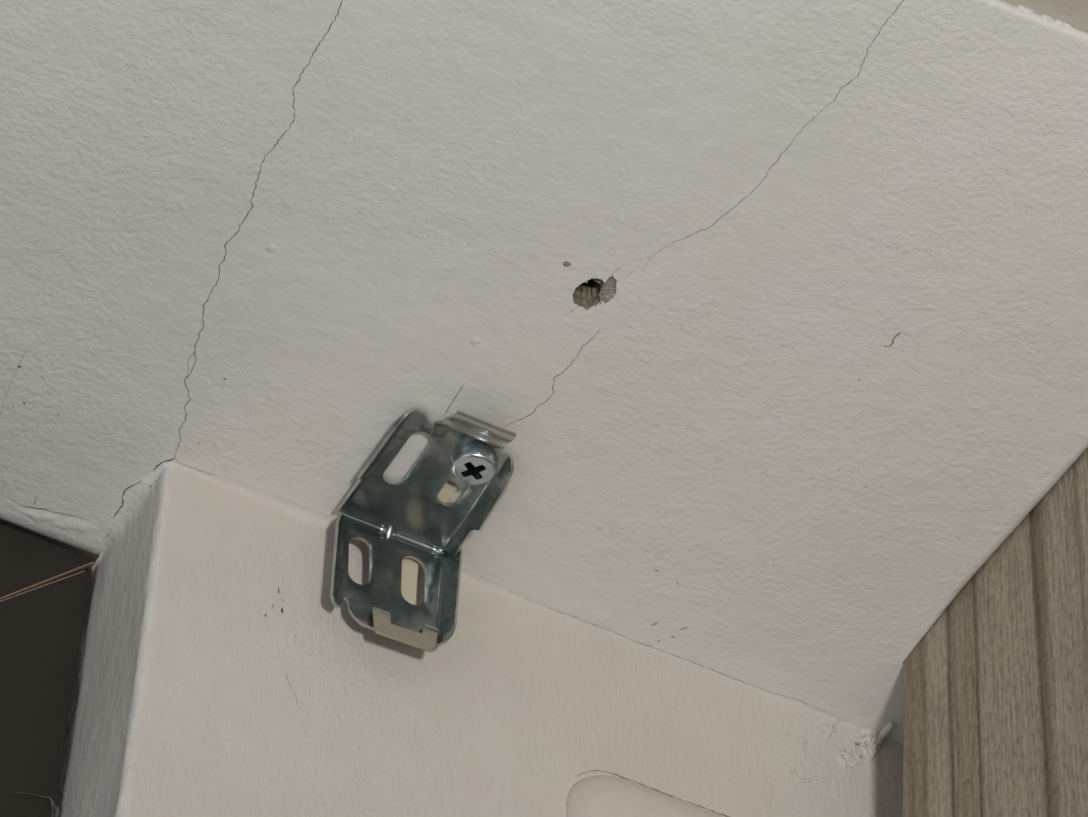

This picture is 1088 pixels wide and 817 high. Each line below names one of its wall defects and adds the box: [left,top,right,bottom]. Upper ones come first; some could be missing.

crack [613,0,904,277]
crack [106,0,343,537]
spalling [572,274,617,310]
crack [503,329,600,428]
peeling [836,721,895,768]